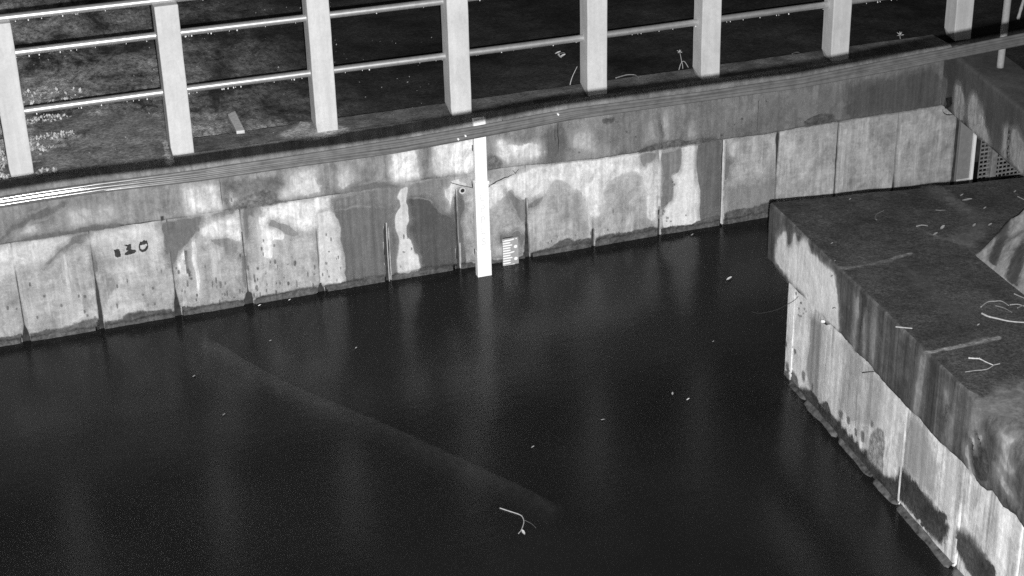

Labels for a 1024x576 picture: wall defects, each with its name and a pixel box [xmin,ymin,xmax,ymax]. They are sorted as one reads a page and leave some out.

damp [0,139,474,322]
damp [489,109,682,246]
damp [688,131,783,220]
damp [877,355,983,509]